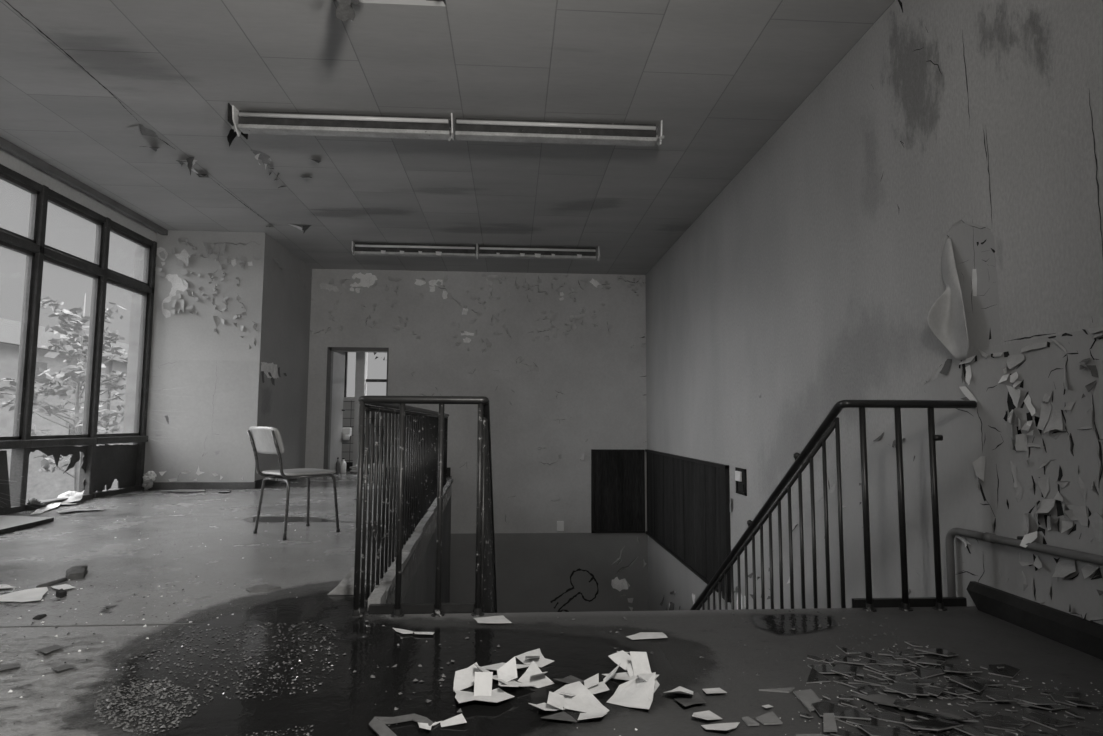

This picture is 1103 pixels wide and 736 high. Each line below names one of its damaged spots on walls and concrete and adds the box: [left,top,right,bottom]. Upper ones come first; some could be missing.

peeling [4,0,274,227]
peeling [155,238,258,349]
peeling [342,272,402,293]
crack [912,29,997,313]
peeling [923,320,1103,582]